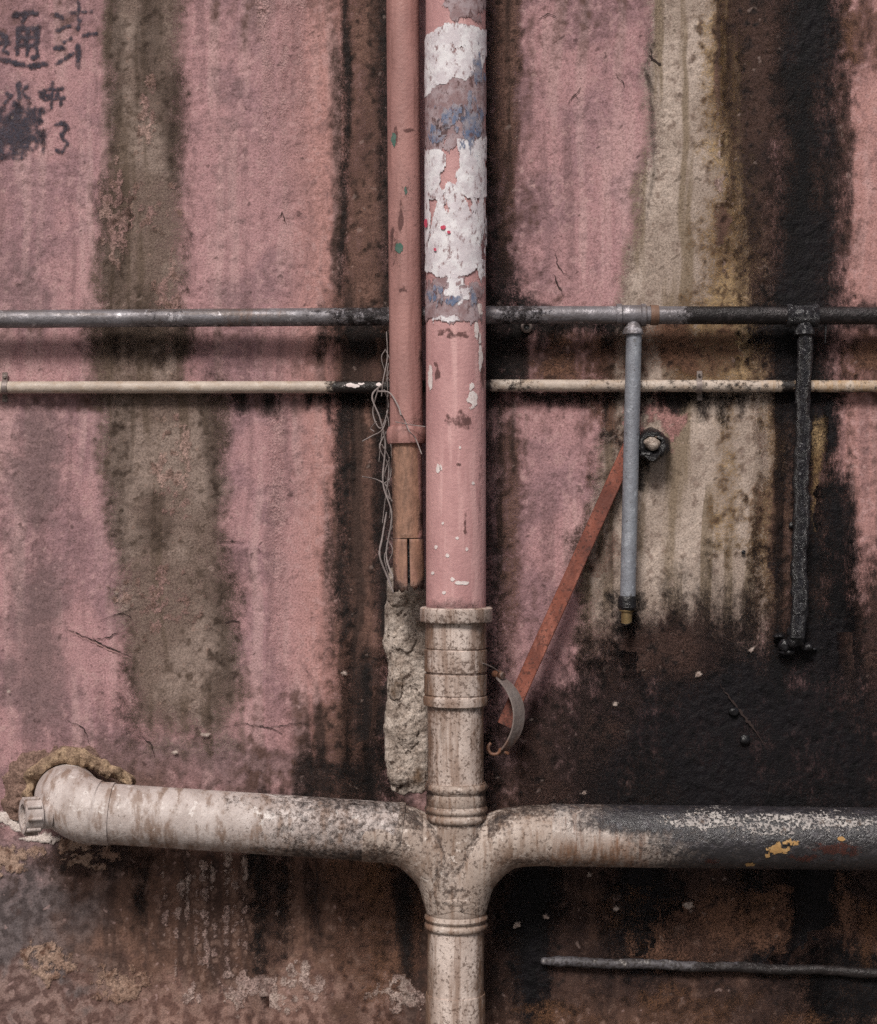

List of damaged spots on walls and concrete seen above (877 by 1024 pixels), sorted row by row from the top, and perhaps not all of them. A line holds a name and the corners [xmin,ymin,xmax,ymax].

leakage [90,0,190,309]
leakage [321,0,389,308]
crack [67,606,140,659]
leakage [85,327,287,756]
leakage [282,326,410,806]
leakage [640,338,795,644]
leakage [808,395,877,696]
spalling [0,746,136,877]
spalling [20,941,152,1004]
leakage [162,852,325,1018]
leakage [494,866,562,1024]
leakage [597,867,686,993]